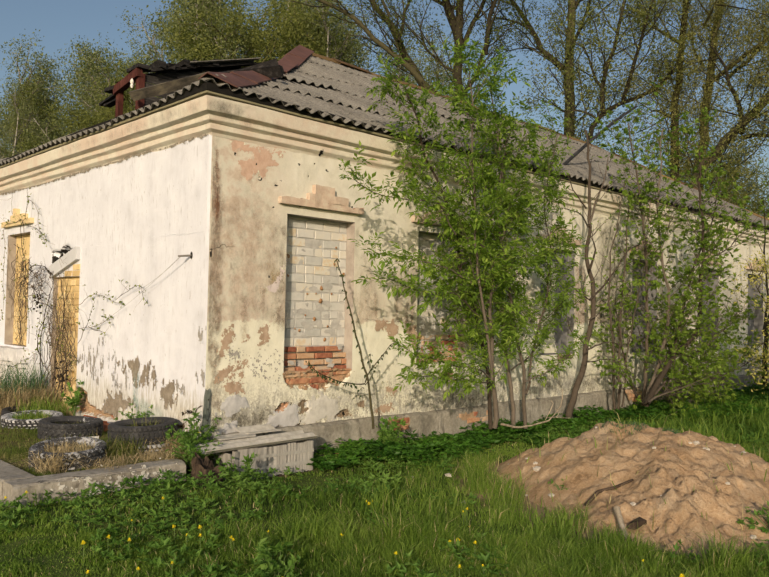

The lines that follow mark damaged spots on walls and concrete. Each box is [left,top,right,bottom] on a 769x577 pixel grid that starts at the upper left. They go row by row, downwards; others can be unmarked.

peeling [230,140,286,181]
leakage [210,199,223,313]
peeling [76,337,193,430]
spalling [195,324,351,414]
peeling [375,317,418,352]